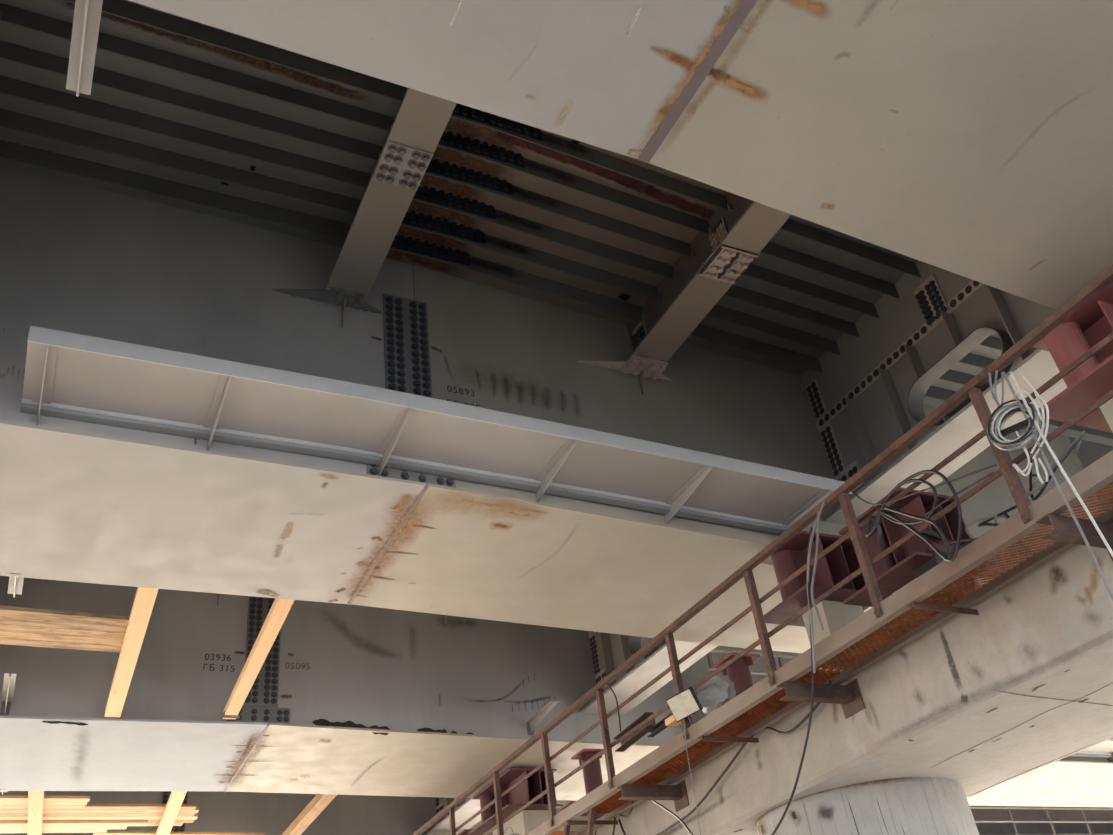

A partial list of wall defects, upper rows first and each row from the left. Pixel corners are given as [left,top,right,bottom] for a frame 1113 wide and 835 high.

rust [657,0,764,127]
rust [329,496,433,602]
rust [220,735,275,783]